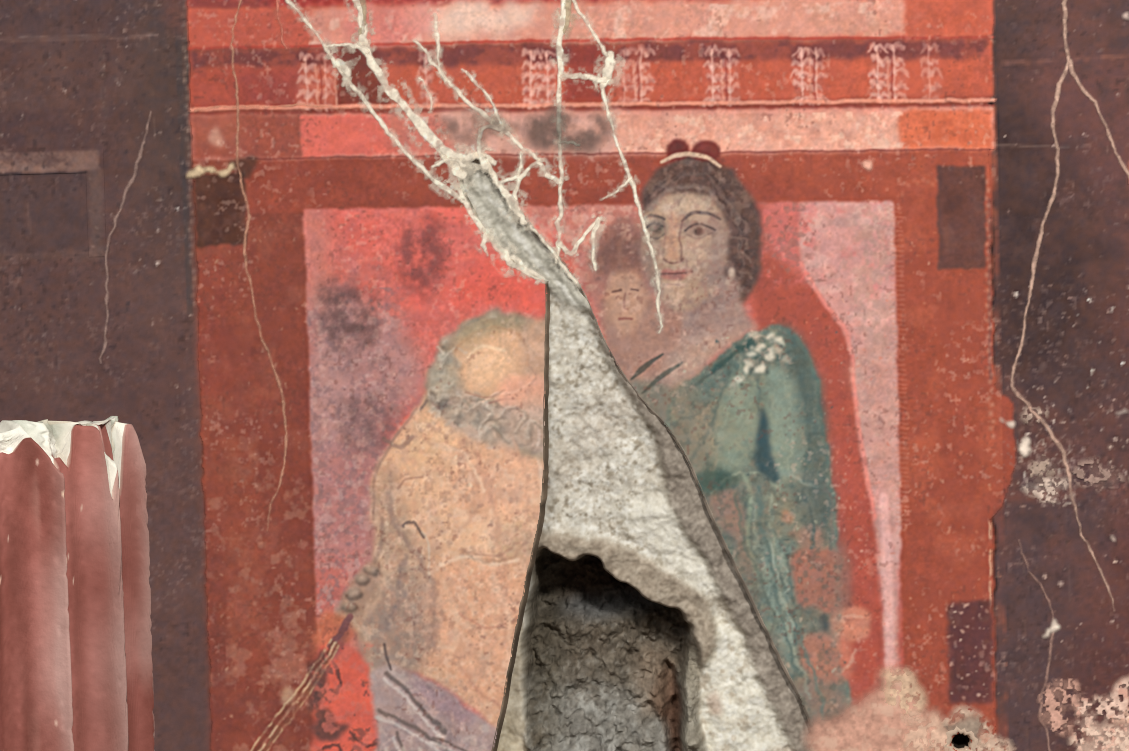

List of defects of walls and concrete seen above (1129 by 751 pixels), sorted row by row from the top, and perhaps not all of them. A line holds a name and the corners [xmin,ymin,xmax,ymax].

crack [100,124,148,358]
crack [217,0,287,485]
crack [276,0,663,332]
spalling [457,158,1012,751]
crack [1011,0,1129,600]
peeling [1039,677,1129,751]